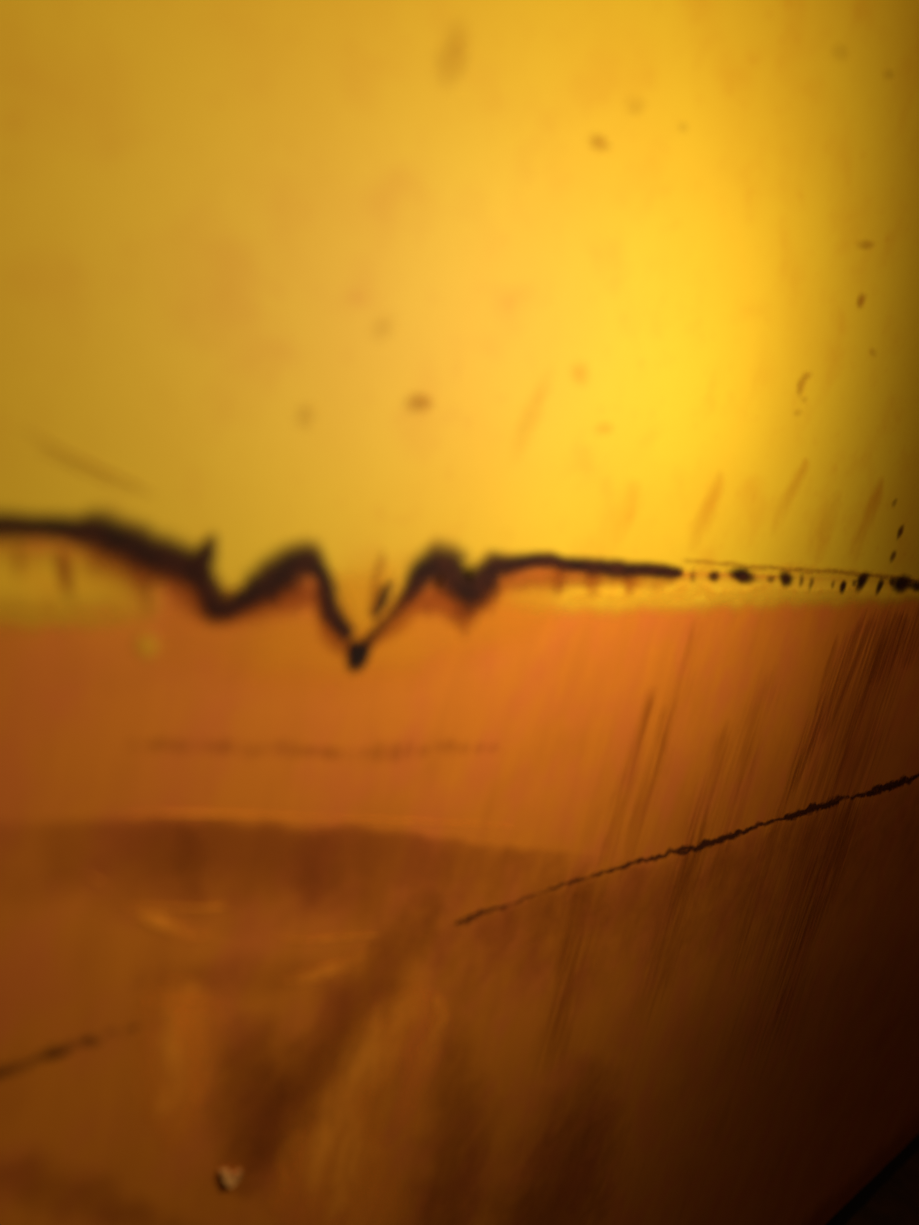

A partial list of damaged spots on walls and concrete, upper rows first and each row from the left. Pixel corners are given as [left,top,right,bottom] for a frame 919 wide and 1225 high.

crack [0,514,792,670]
crack [840,574,919,592]
crack [457,774,919,924]